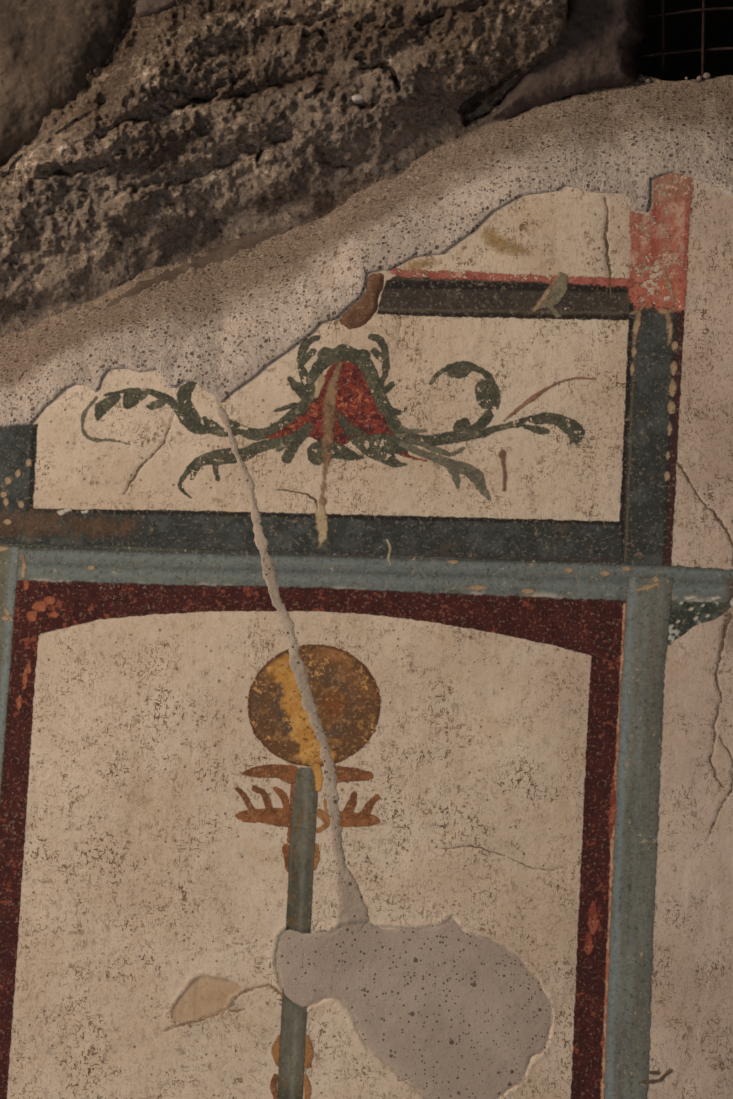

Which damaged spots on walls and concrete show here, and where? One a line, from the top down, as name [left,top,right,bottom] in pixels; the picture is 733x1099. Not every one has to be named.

spalling [532,272,568,318]
peeling [630,303,647,375]
peeling [659,270,678,436]
crack [677,463,733,564]
crack [213,396,370,933]
crack [708,613,733,835]
flaking render [171,974,241,1022]